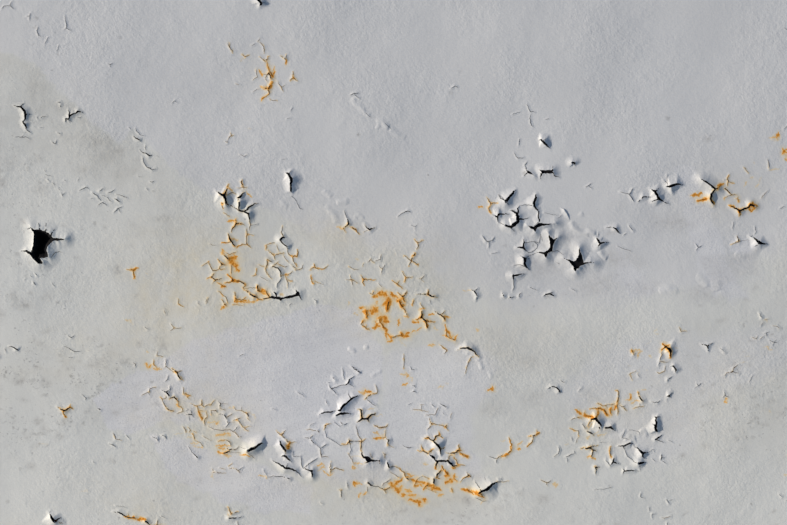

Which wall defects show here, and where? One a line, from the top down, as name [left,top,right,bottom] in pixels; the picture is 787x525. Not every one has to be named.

crack [510,101,581,168]
peeling [18,215,77,274]
crack [279,157,305,211]
crack [591,222,636,253]
crack [617,172,686,207]
crack [718,170,787,253]
corrosion [344,281,417,347]
crack [287,208,578,378]
crack [53,393,104,423]
crack [187,433,267,481]
crack [318,350,454,507]
crack [486,324,715,525]